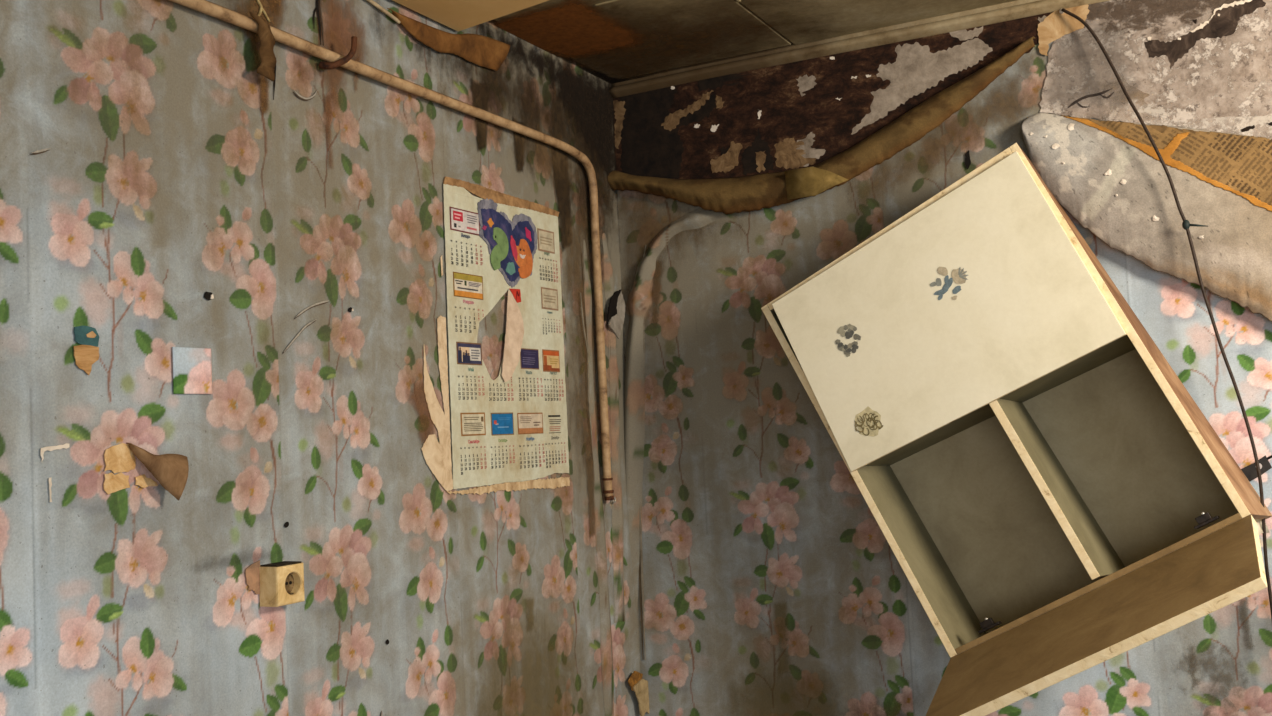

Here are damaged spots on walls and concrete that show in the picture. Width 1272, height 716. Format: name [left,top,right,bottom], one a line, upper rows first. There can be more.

peeling [387,8,510,71]
flaking render [1039,0,1272,138]
damp [416,0,1053,536]
damp [1240,599,1251,647]
damp [1182,646,1234,716]